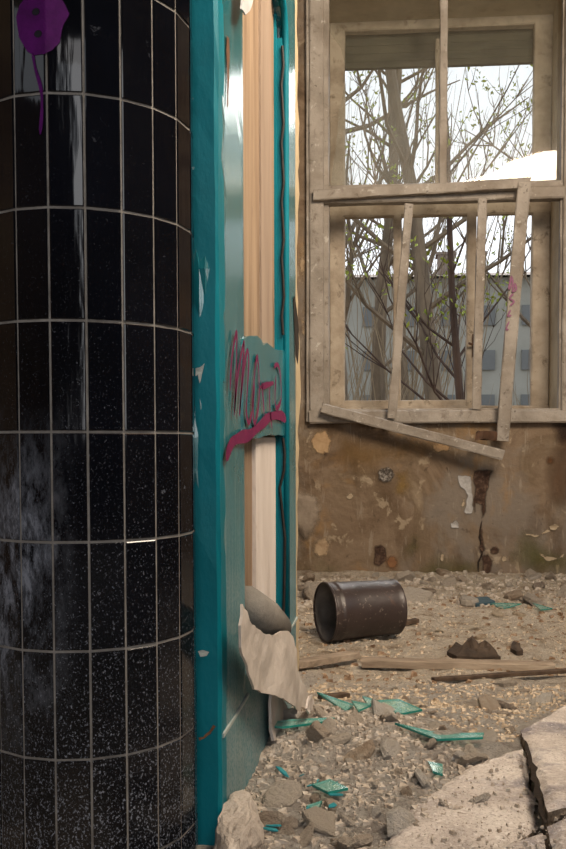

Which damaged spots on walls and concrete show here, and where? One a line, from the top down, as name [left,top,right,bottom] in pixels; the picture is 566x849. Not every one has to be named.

peeling [240,0,253,15]
flaking render [458,470,492,516]
flaking render [297,491,329,556]
crack [476,522,484,572]
flaking render [479,526,507,574]
flaking render [268,695,288,741]
crack [525,740,547,823]